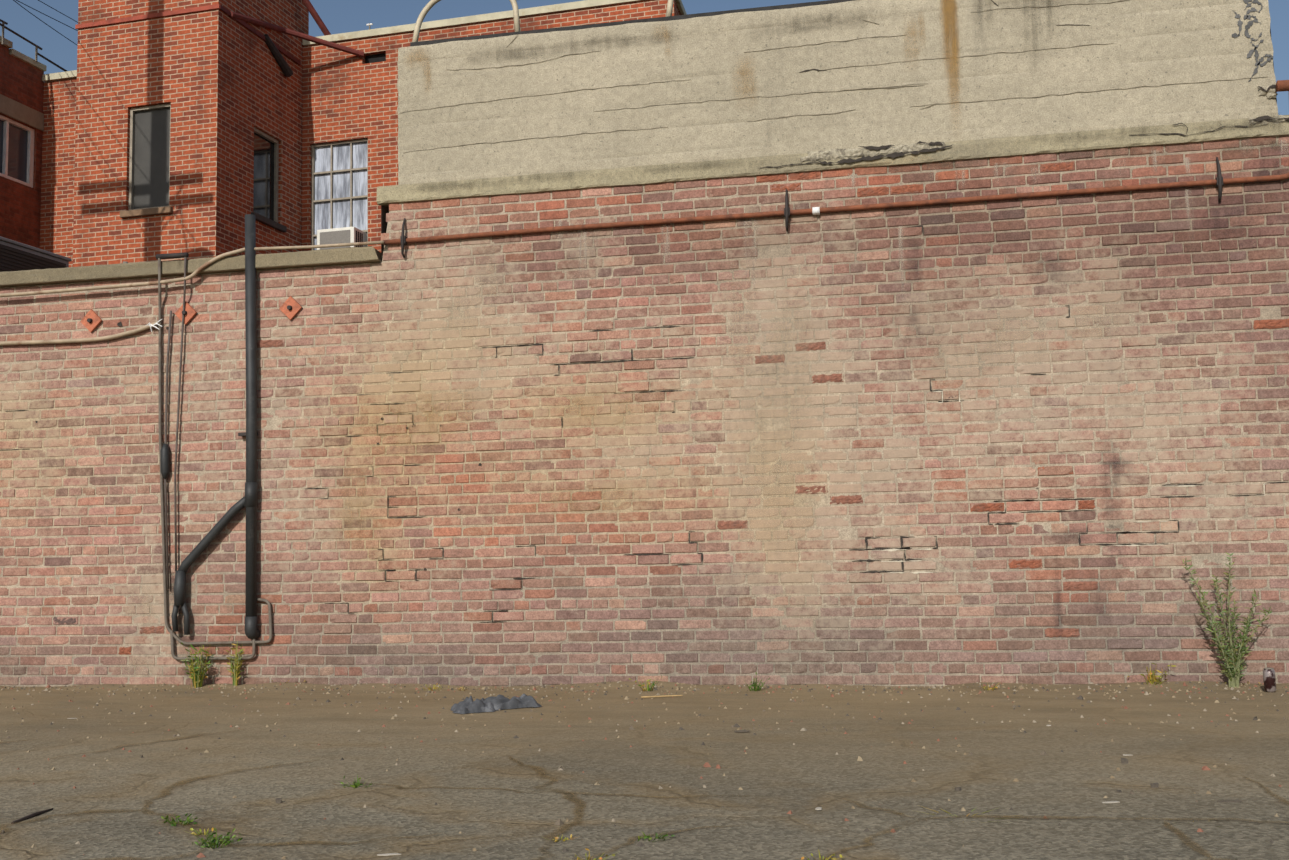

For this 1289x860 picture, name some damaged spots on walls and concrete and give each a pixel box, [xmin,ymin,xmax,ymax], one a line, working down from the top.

crack [402,0,1289,153]
spalling [756,141,952,191]
spalling [857,184,923,197]
spalling [1040,162,1073,172]